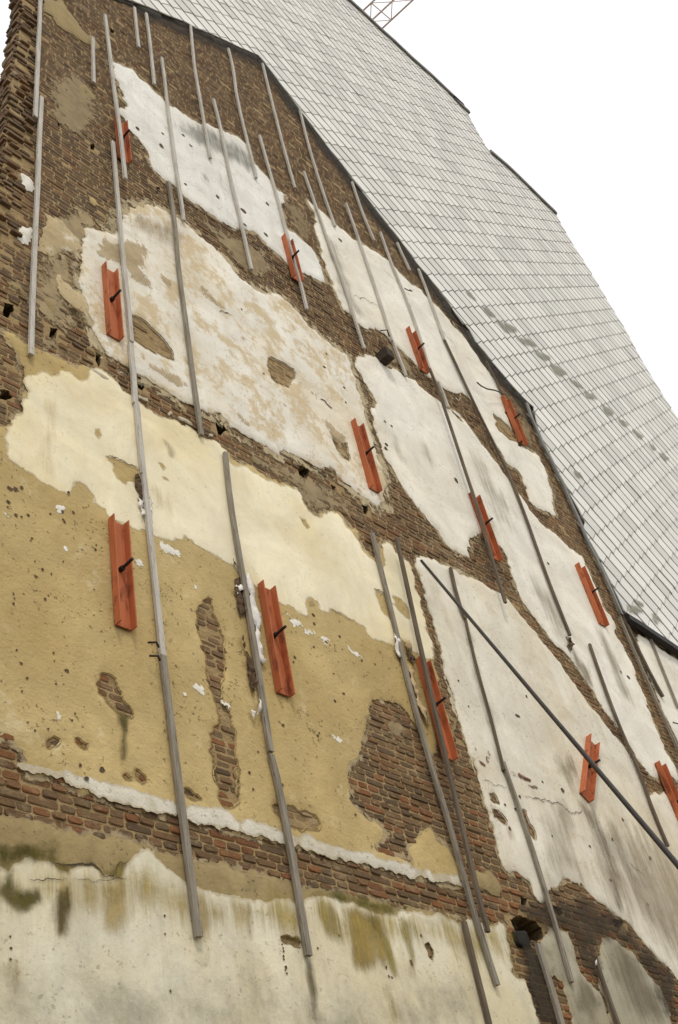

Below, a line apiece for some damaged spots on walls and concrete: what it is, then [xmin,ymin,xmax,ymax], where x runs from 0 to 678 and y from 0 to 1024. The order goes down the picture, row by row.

flaking render [0,181,558,603]
flaking render [0,409,678,1024]
crack [482,779,583,814]
damp [1,876,40,910]
damp [57,883,70,934]
damp [319,901,417,973]